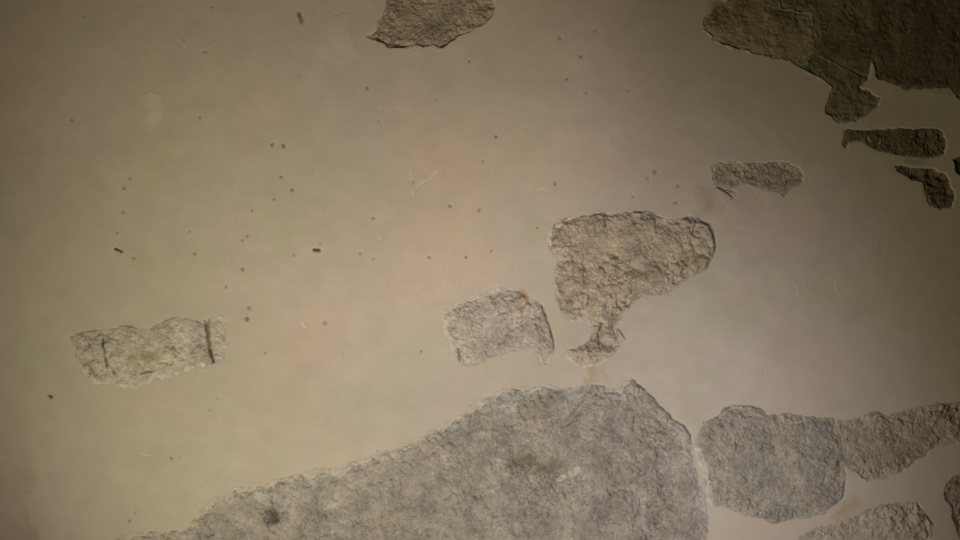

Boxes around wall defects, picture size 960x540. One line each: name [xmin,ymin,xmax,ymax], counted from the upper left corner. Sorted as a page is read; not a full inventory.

flaking render [368,0,495,50]
flaking render [702,0,960,209]
flaking render [70,315,231,390]
flaking render [442,211,716,368]
flaking render [113,378,960,540]